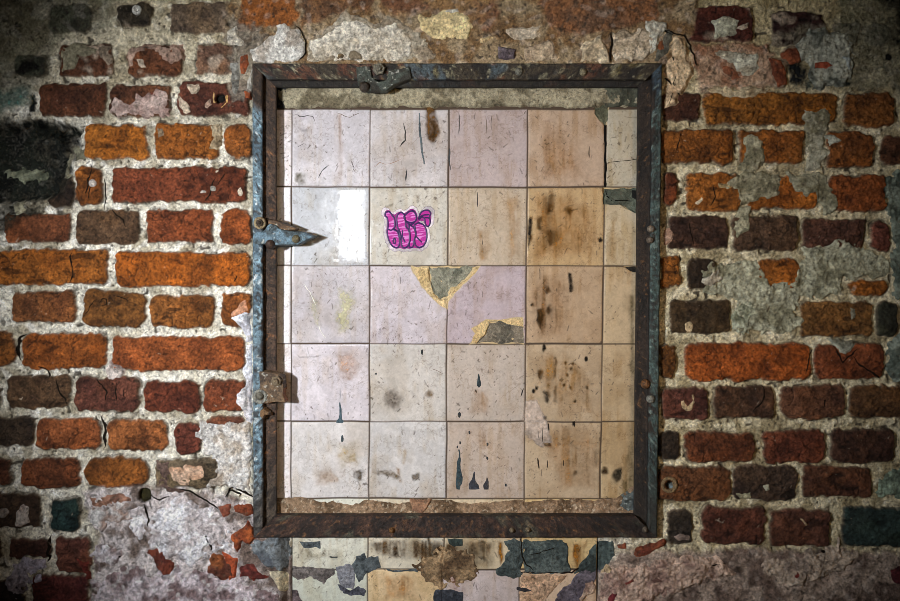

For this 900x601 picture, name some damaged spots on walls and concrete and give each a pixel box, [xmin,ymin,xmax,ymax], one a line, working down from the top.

peeling [580,20,673,64]
corrosion [426,107,440,142]
damp [0,89,82,232]
peeling [718,108,841,238]
spalling [701,169,900,336]
spalling [413,265,479,309]
spalling [471,318,524,344]
crack [144,487,253,526]
peeling [156,420,479,601]
crack [45,536,53,562]
spalling [147,548,174,575]
spalling [495,533,736,601]